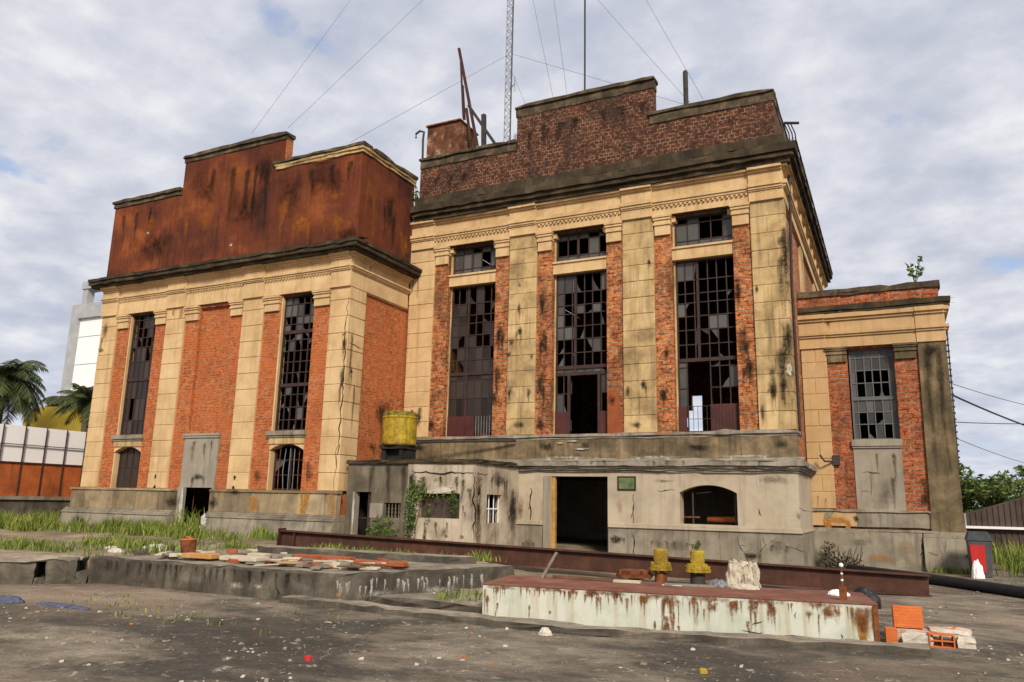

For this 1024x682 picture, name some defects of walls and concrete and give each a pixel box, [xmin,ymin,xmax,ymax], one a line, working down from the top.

damp [779,229,790,284]
crack [333,300,362,490]
damp [768,324,793,398]
damp [924,346,943,428]
damp [337,574,483,594]
corrosion [484,586,717,630]